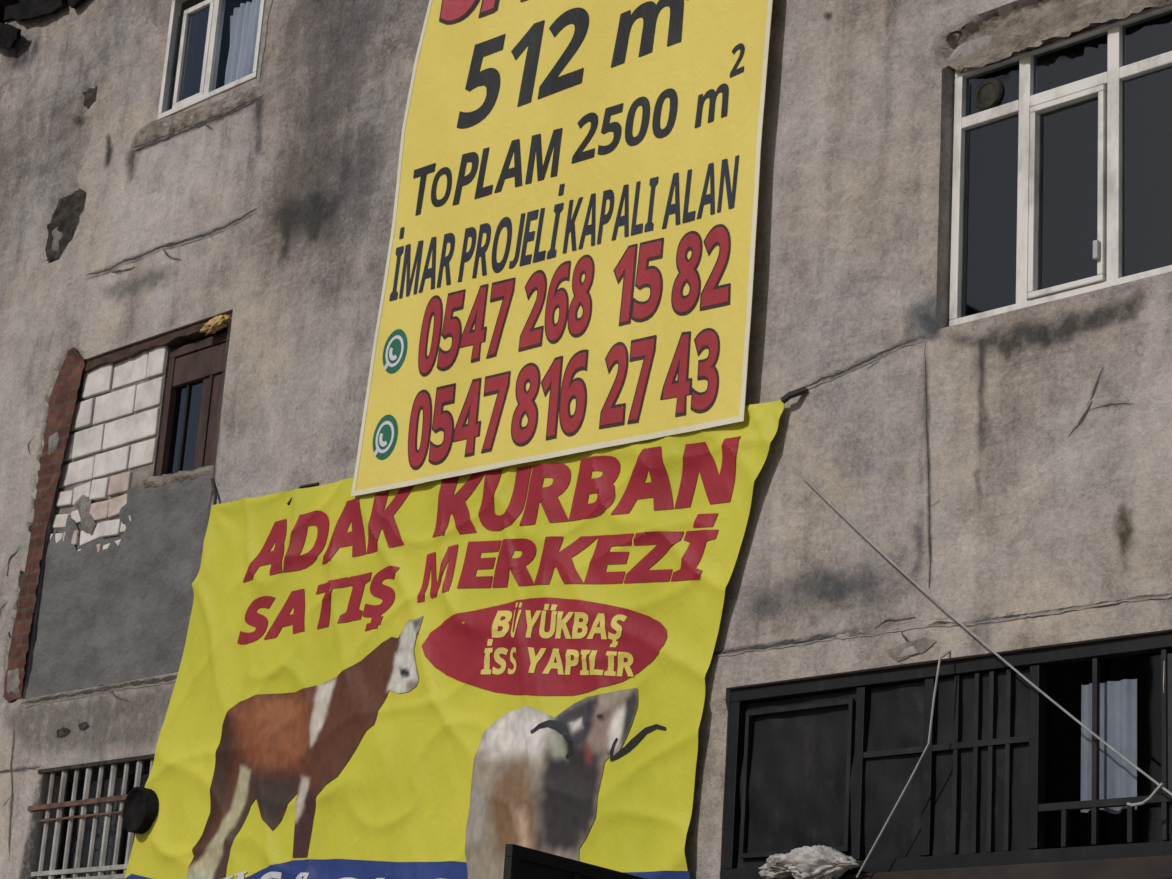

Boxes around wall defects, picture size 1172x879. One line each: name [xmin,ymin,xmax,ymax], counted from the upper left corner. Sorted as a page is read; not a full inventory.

flaking render [940,0,1172,71]
flaking render [45,187,86,261]
crack [85,208,257,279]
leakage [980,301,1135,369]
crack [1068,367,1133,437]
crack [805,337,940,588]
flaking render [3,347,85,702]
crack [713,593,1172,657]
crack [0,675,177,857]